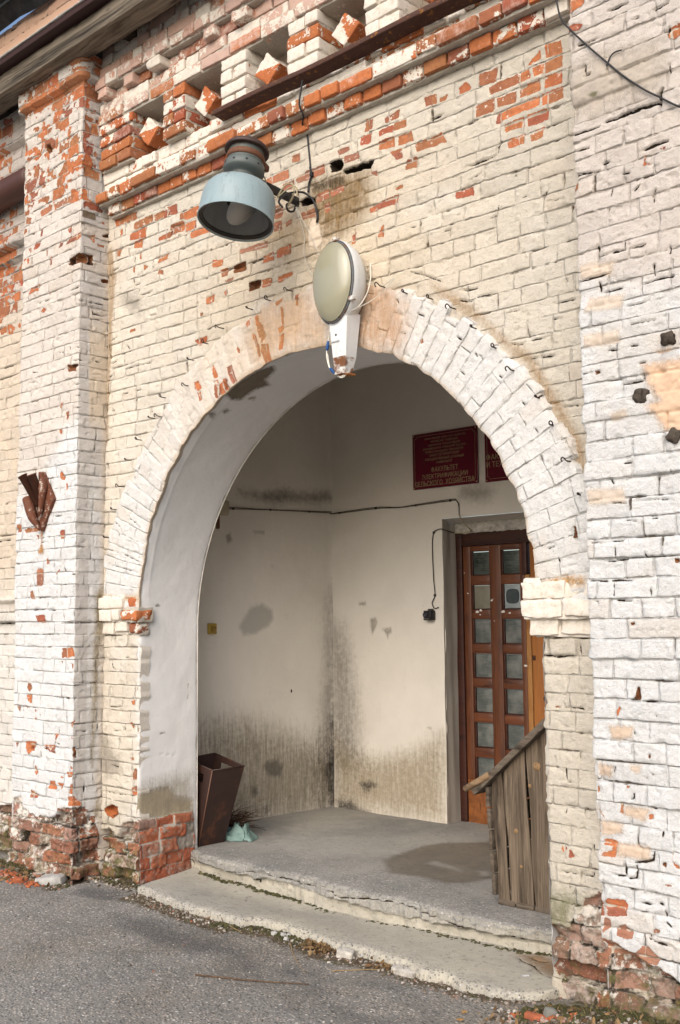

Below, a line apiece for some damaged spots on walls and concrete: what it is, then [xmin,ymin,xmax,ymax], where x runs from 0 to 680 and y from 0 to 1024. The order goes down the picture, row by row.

peeling [0,56,209,335]
damp [313,174,369,231]
spalling [0,720,195,885]
damp [209,729,437,820]
crack [192,860,551,978]
spalling [551,891,680,1024]